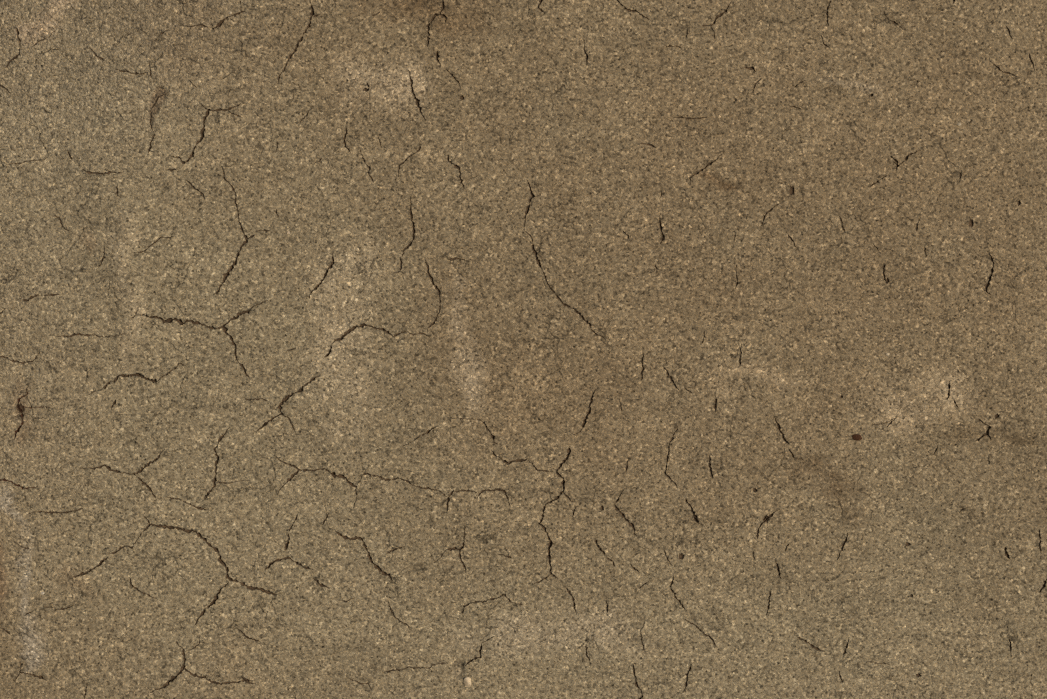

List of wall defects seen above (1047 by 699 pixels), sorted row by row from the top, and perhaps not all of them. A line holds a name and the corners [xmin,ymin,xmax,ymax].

crack [427,0,461,89]
crack [90,48,243,200]
crack [343,70,426,182]
crack [0,199,468,440]
crack [213,167,279,296]
crack [524,180,606,340]
crack [74,427,355,693]
crack [274,455,512,628]
crack [403,388,596,614]
crack [595,540,716,646]
crack [664,426,699,523]
crack [753,511,789,616]